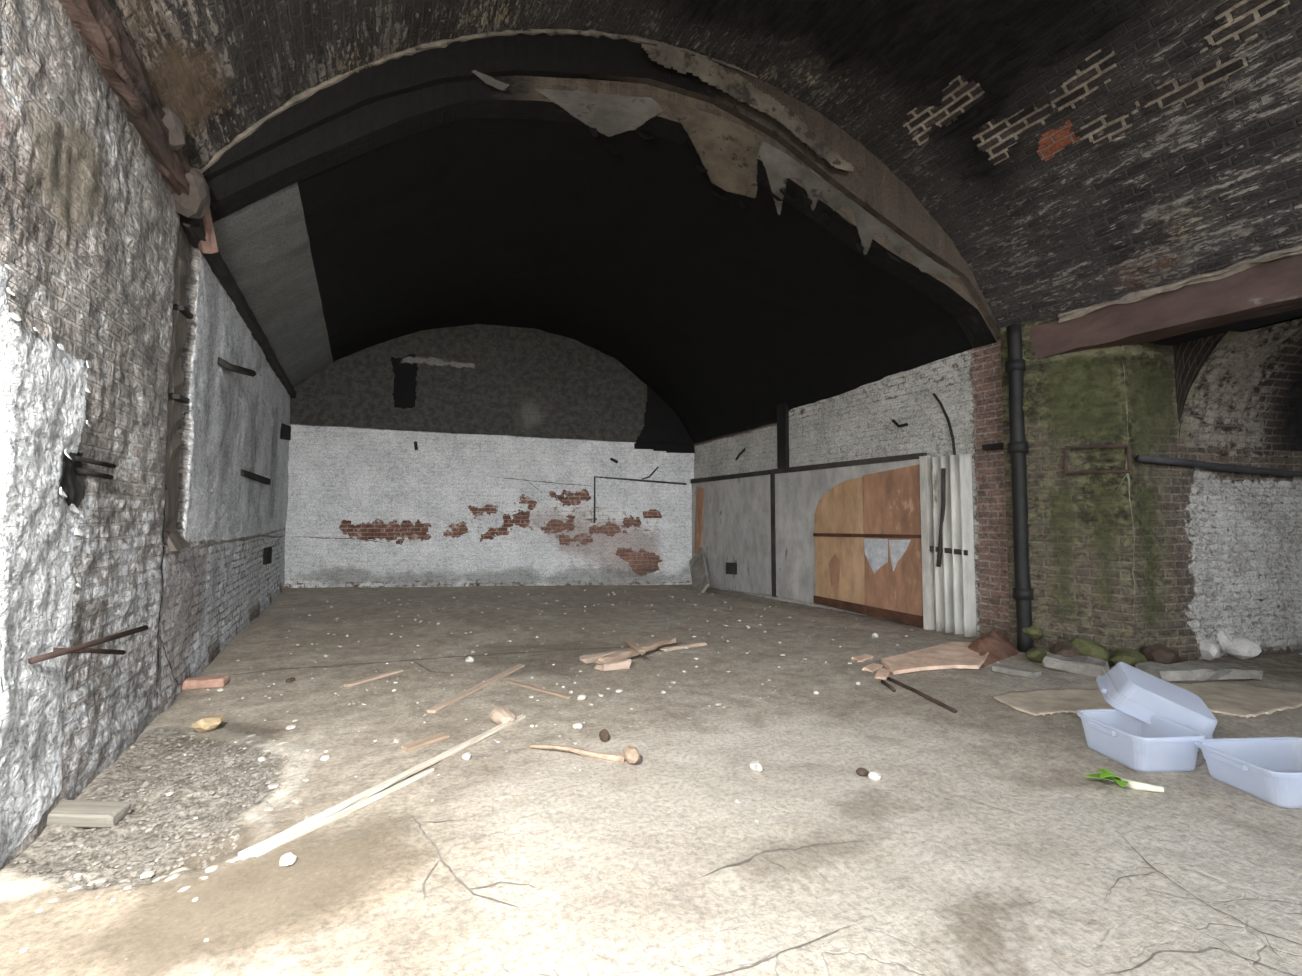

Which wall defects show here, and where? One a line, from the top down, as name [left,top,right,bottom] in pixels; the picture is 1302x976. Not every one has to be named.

flaking render [472,70,509,90]
spalling [902,75,985,146]
spalling [972,0,1290,165]
flaking render [535,43,959,277]
water stain [1050,344,1164,360]
flaking render [339,489,662,576]
crack [402,808,537,907]
crack [700,839,875,878]
crack [710,922,862,976]
crack [1100,836,1302,976]